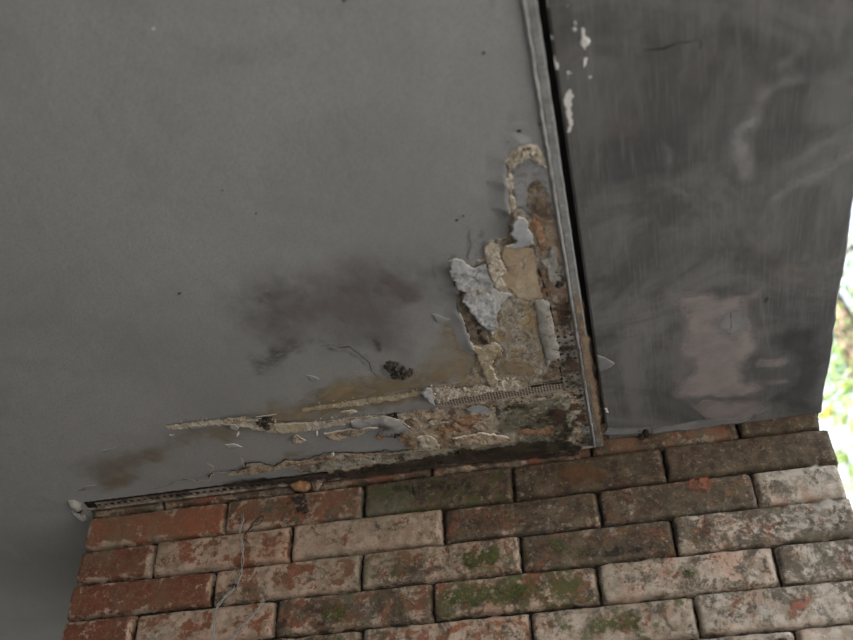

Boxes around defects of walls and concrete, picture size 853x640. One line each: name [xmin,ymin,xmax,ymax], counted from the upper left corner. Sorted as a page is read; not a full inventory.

flaking render [155,132,585,489]
water stain [224,298,589,488]